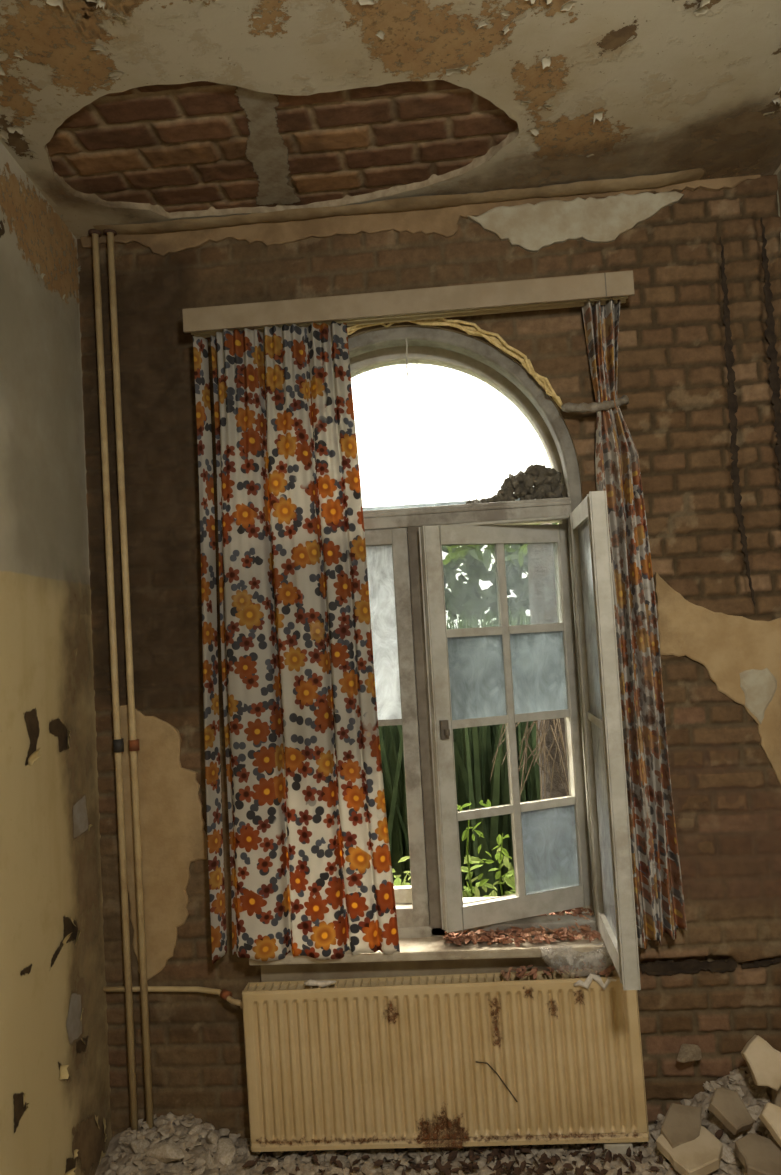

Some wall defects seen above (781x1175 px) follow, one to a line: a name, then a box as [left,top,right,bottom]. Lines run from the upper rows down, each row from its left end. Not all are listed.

peeling [673,0,721,16]
peeling [596,20,639,58]
flaking render [0,0,632,219]
leakage [428,104,781,196]
peeling [24,708,71,766]
peeling [51,916,81,967]
peeling [66,993,88,1054]
peeling [58,1062,69,1081]
peeling [13,1092,29,1133]
peeling [65,1113,107,1175]